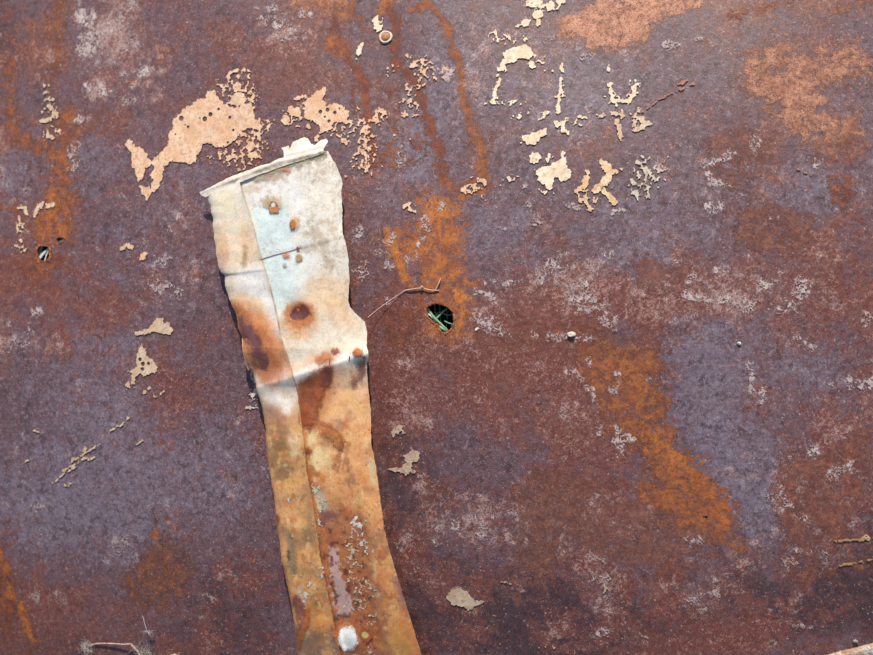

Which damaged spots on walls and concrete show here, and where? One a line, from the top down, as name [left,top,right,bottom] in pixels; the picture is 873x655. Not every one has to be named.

peeling [399,53,452,117]
peeling [484,0,652,195]
peeling [125,67,388,201]
peeling [461,176,487,201]
peeling [574,153,669,212]
peeling [125,318,173,394]
peeling [446,588,484,611]